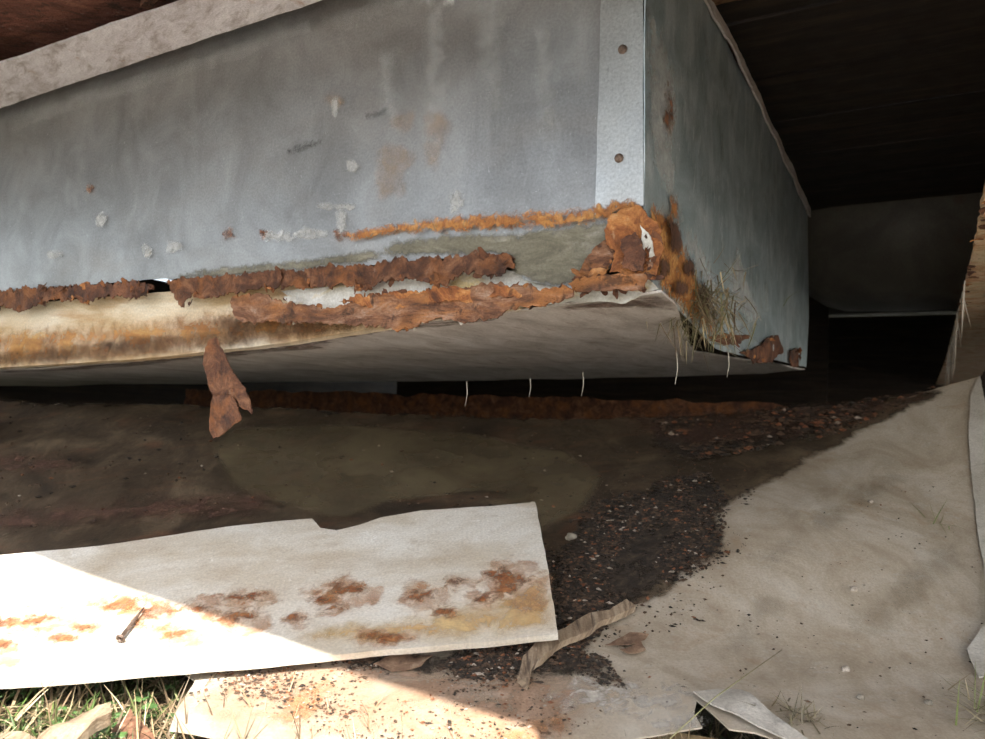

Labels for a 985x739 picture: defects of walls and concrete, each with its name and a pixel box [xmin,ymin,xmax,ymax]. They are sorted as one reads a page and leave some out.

rust [167,49,722,338]
rust [0,277,154,313]
rust [43,337,253,438]
rust [260,340,331,351]